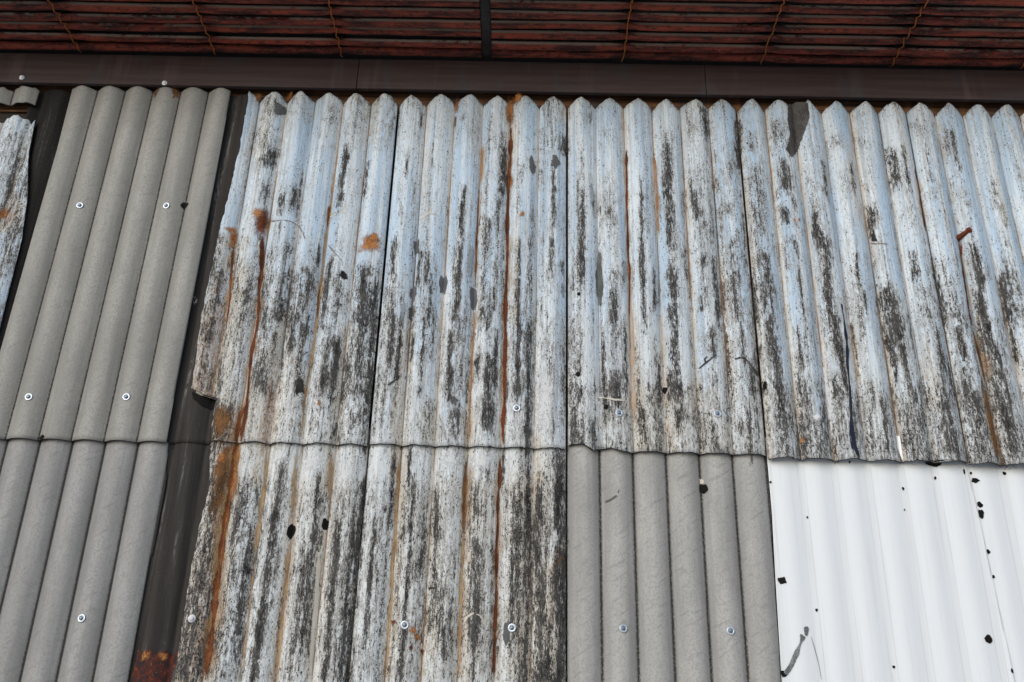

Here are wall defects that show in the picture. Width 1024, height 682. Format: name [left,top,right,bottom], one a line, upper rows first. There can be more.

spalling [192,392,217,410]
rust [203,209,270,674]
rust [358,233,380,251]
damp [321,236,435,411]
damp [446,185,466,402]
rust [501,93,524,443]
damp [638,177,682,432]
damp [811,212,849,464]
crack [841,304,859,456]
damp [229,495,281,682]
damp [322,448,416,682]
rust [492,458,502,674]